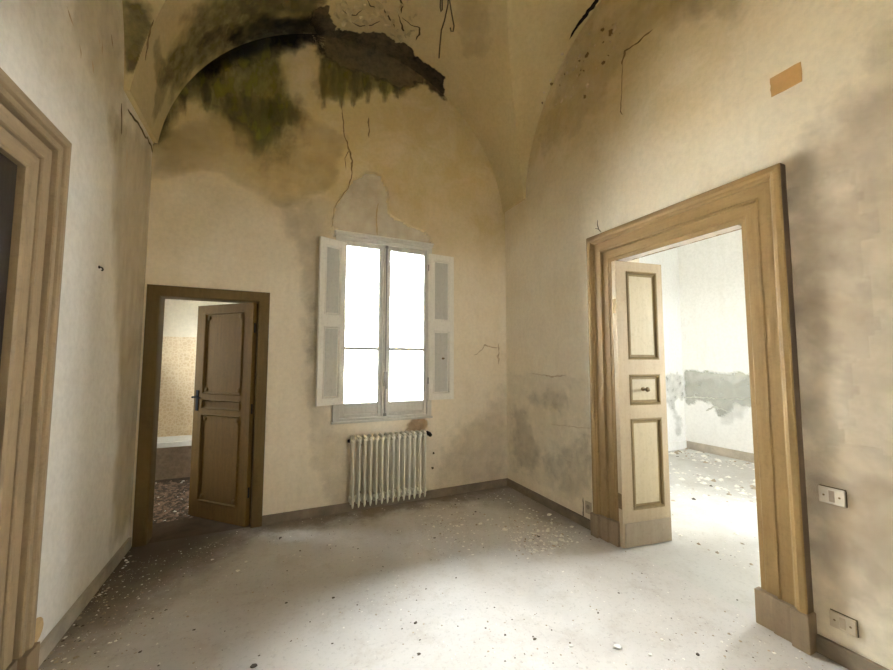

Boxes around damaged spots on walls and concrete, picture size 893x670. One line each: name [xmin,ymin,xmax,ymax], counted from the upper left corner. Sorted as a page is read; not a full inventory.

leakage [154,0,324,149]
spalling [312,0,445,100]
crack [570,0,599,38]
crack [620,29,653,114]
crack [121,103,153,153]
crack [332,100,353,225]